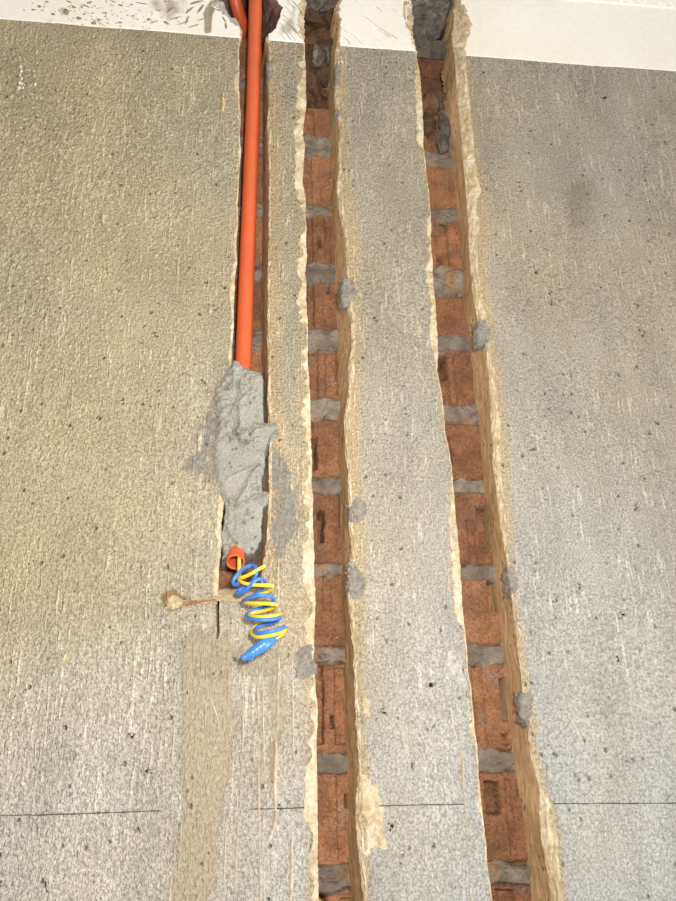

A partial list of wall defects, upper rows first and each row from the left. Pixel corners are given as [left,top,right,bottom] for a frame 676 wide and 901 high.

crack [165,596,220,639]